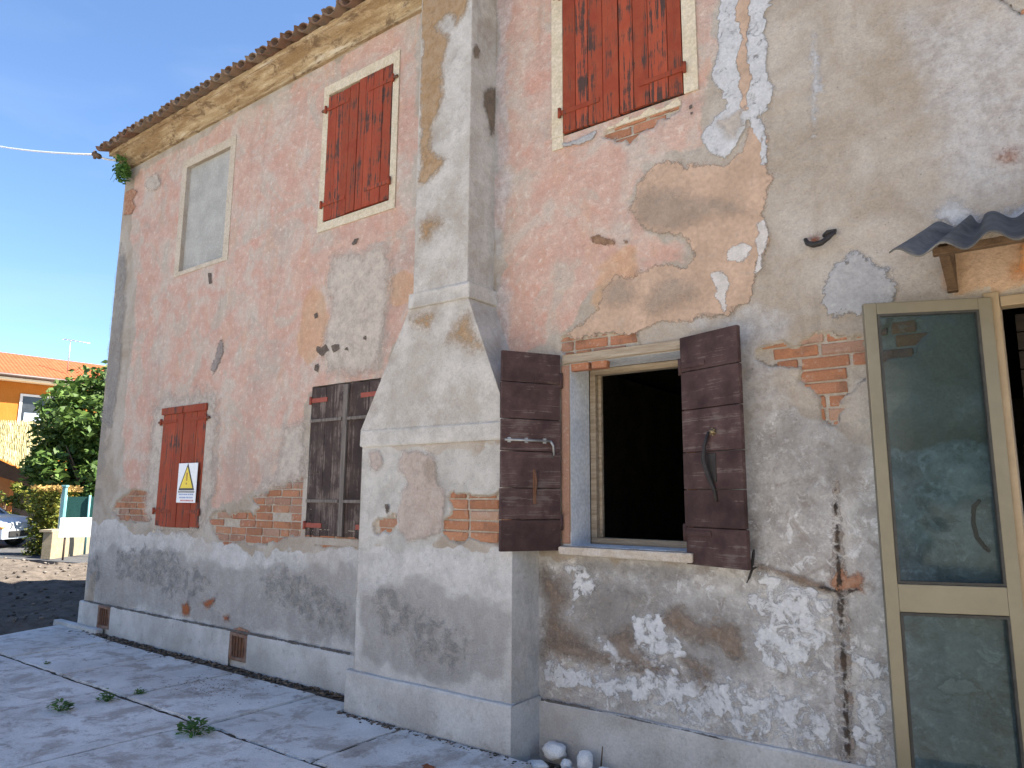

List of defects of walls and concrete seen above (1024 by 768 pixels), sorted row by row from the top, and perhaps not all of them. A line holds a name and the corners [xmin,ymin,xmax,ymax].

flaking render [561,0,774,372]
flaking render [755,330,867,426]
flaking render [881,316,933,362]
flaking render [114,390,359,548]
flaking render [373,451,516,546]
damp [563,559,597,615]
damp [543,572,834,751]
crack [818,479,859,764]
damp [843,646,889,767]